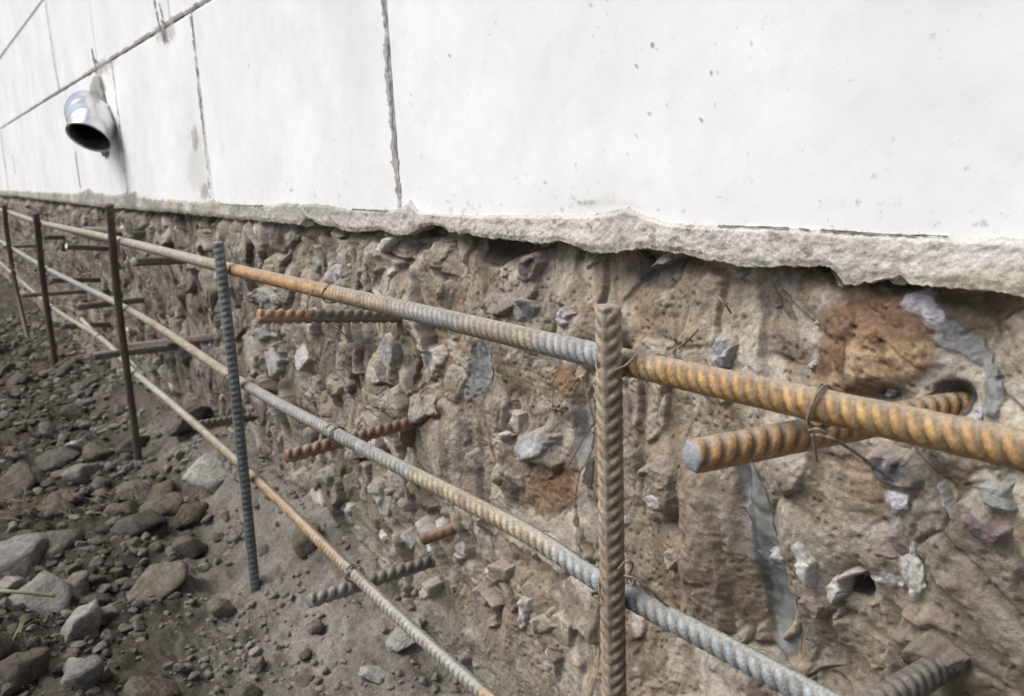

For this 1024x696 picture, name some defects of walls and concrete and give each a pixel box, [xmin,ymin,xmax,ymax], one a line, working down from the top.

spalling [0,203,1024,696]
rust [812,297,935,394]